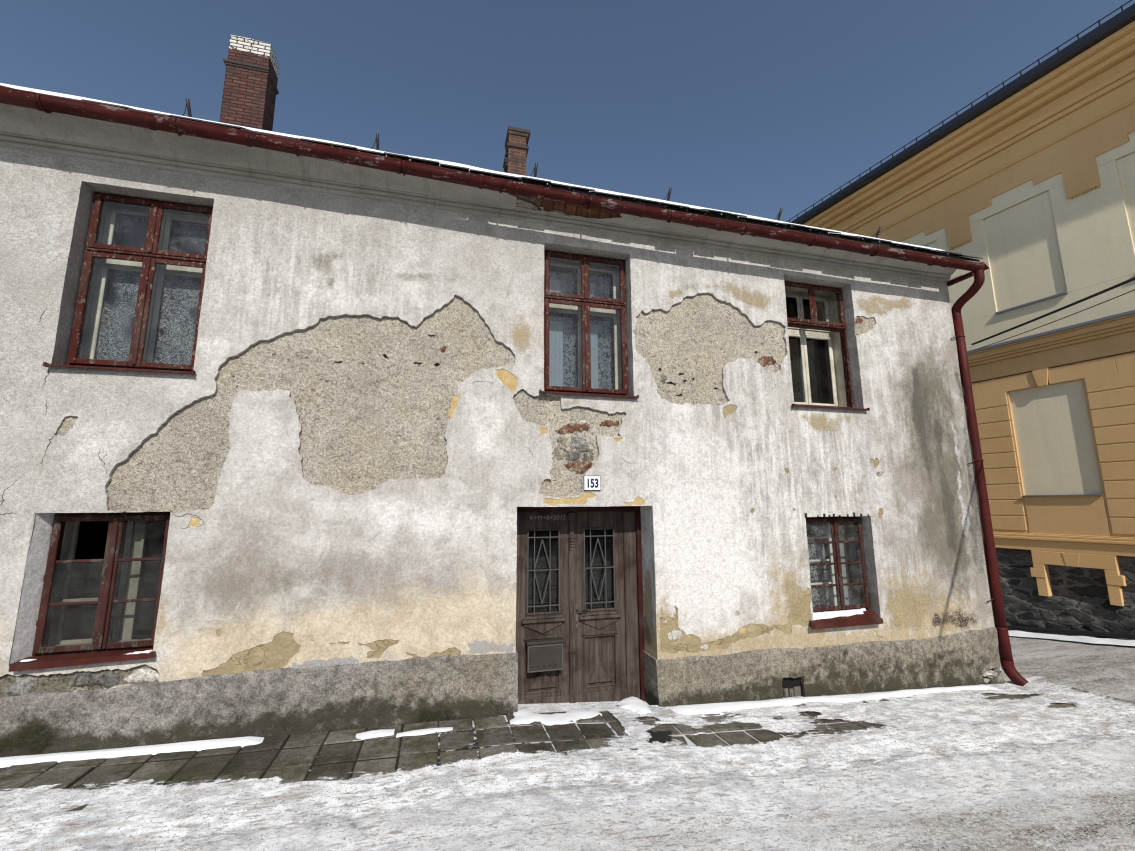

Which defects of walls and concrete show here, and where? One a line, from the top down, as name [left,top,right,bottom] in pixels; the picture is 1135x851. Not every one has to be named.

flaking render [633,293,786,418]
flaking render [107,295,626,527]
damp [907,366,979,590]
flaking render [0,664,160,697]
peeling [202,631,314,676]
peeling [330,639,461,658]
peeling [659,588,811,654]
damp [881,585,978,629]